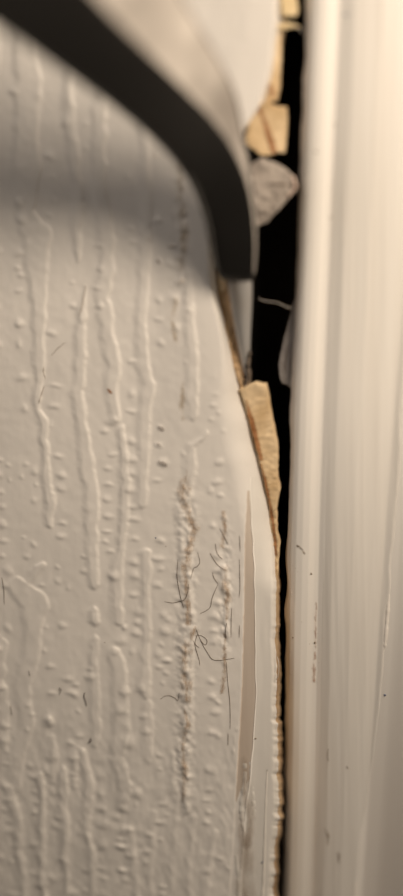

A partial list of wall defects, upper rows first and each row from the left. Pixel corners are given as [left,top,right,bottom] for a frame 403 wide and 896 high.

spalling [246,0,300,155]
crack [246,0,306,896]